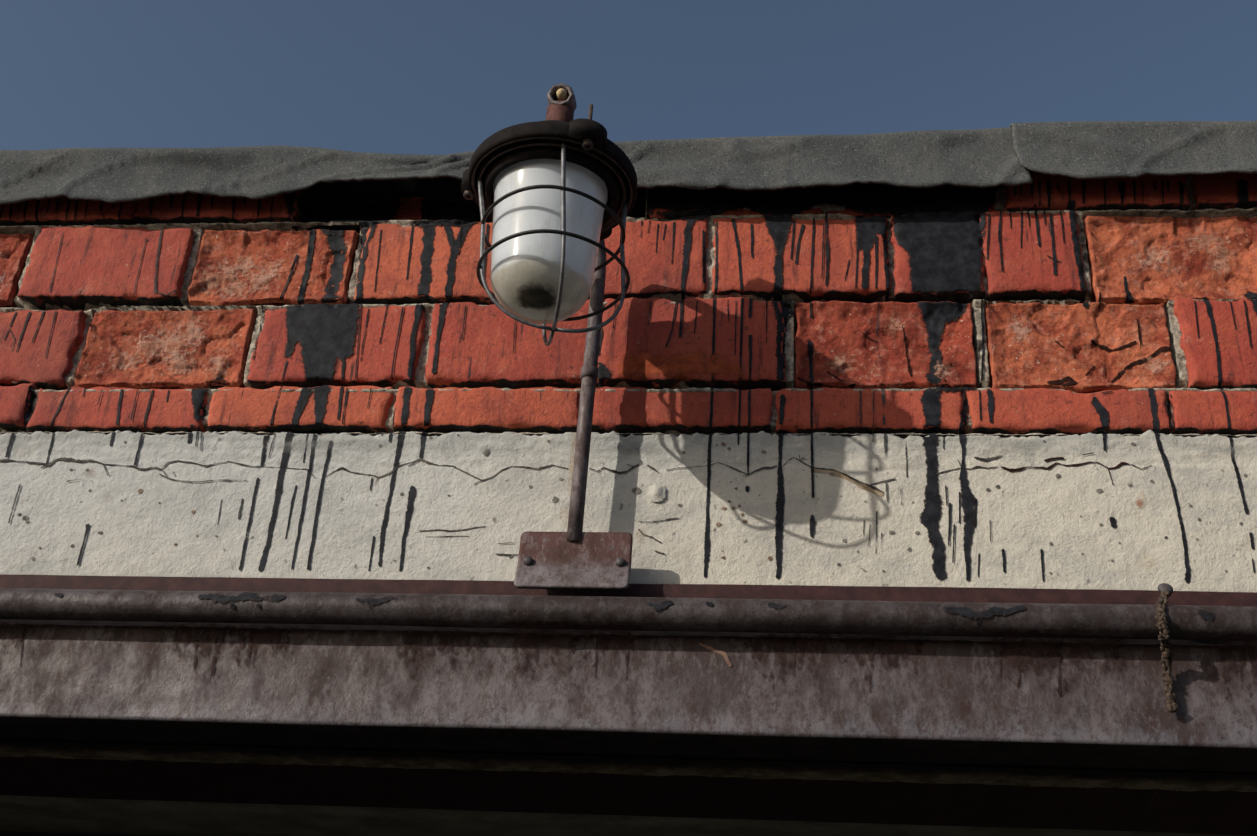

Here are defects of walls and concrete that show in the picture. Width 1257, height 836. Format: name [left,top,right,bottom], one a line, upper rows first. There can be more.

crack [1055,318,1171,383]
water stain [238,224,489,572]
crack [0,455,895,497]
water stain [859,389,887,455]
water stain [863,446,908,553]
water stain [920,299,1006,581]
crack [937,452,1151,485]
water stain [198,592,285,609]
corrosion [167,622,298,676]
corrosion [388,621,646,689]
corrosion [735,633,935,692]
corrosion [986,628,1134,697]